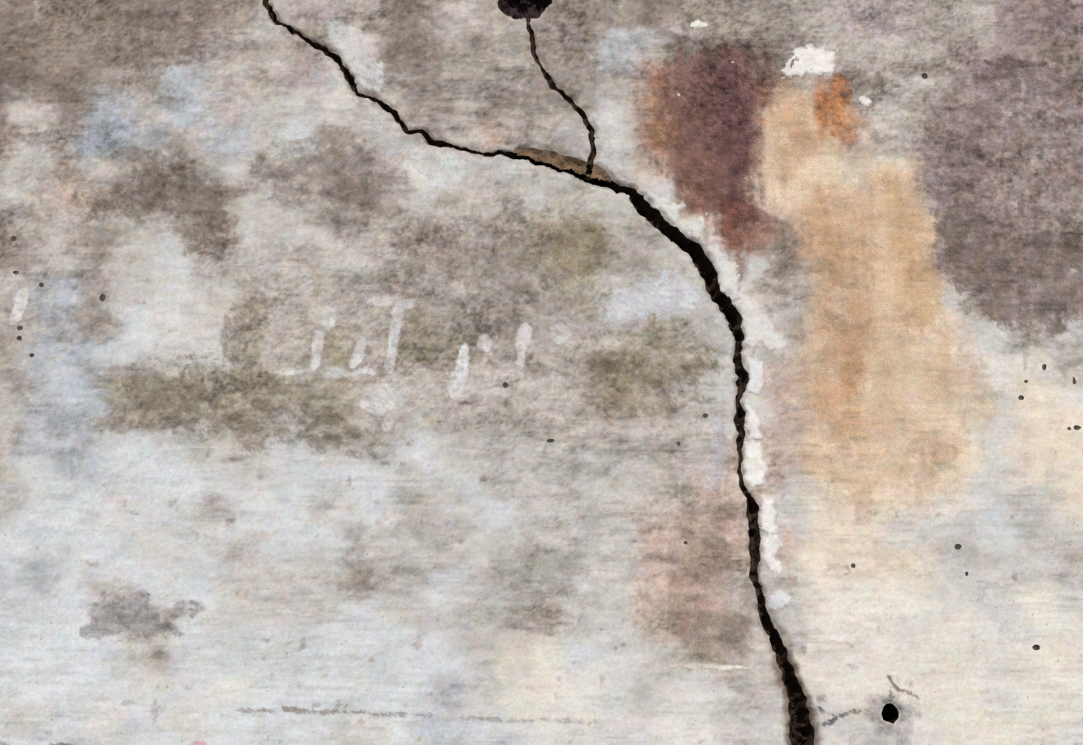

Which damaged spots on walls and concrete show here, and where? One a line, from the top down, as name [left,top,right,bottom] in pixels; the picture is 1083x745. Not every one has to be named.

corrosion [816,74,856,142]
corrosion [648,45,772,240]
crack [262,0,857,745]
crack [238,707,346,715]
crack [888,676,916,701]